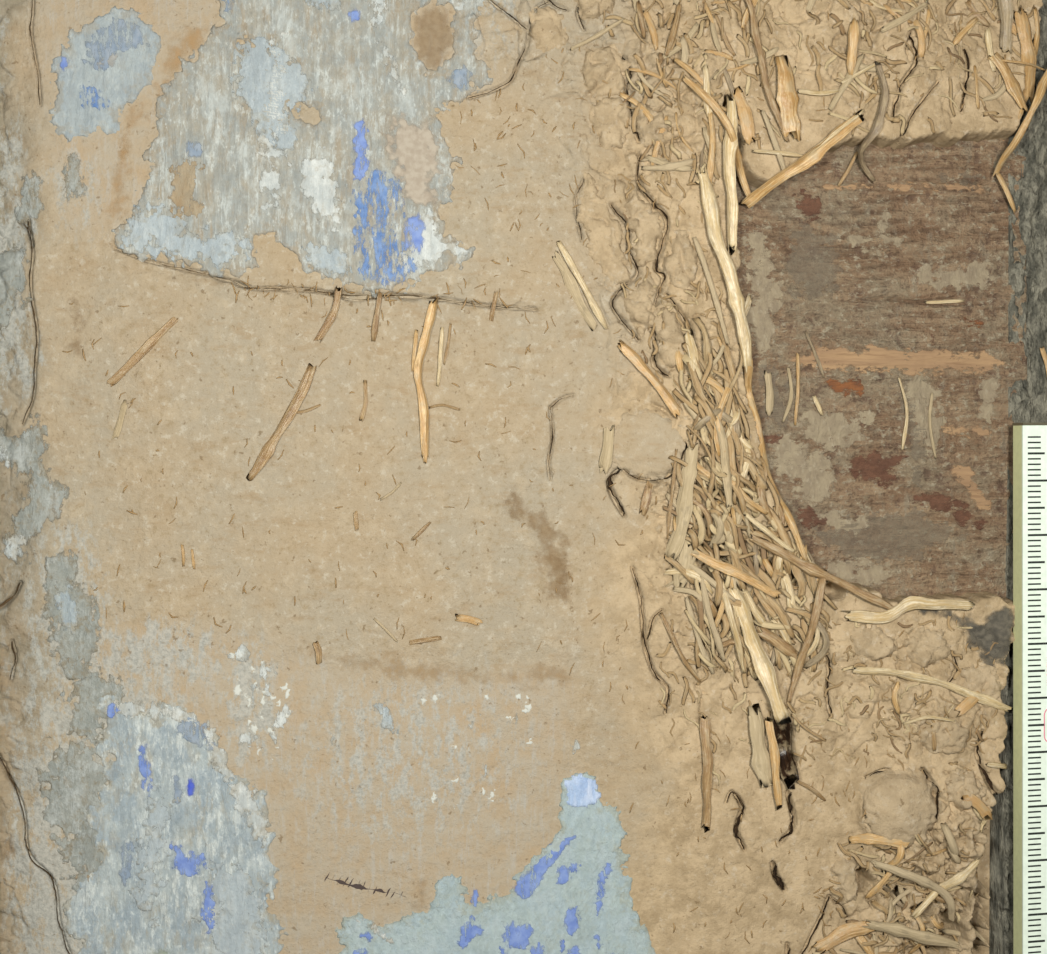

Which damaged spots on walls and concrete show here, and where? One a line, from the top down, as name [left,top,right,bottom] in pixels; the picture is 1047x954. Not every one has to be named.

peeling [49,0,493,298]
flaking render [576,171,698,368]
crack [0,582,21,607]
peeling [0,410,292,954]
peeling [505,694,532,723]
flaking render [850,623,951,668]
flaking render [912,719,973,755]
flaking render [960,663,1005,702]
crack [0,758,70,954]
peeling [335,770,656,954]
flaking render [830,857,858,905]
flaking render [944,767,987,954]